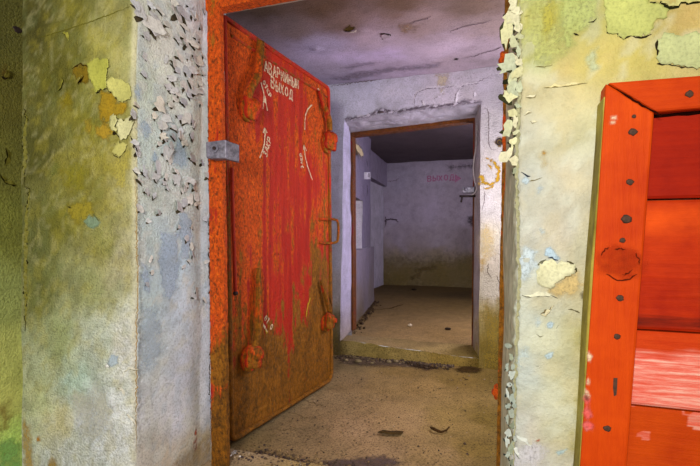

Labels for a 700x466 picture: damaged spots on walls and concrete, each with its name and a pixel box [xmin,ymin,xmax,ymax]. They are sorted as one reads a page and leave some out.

peeling [68,0,209,297]
crack [414,77,496,150]
peeling [496,0,700,466]